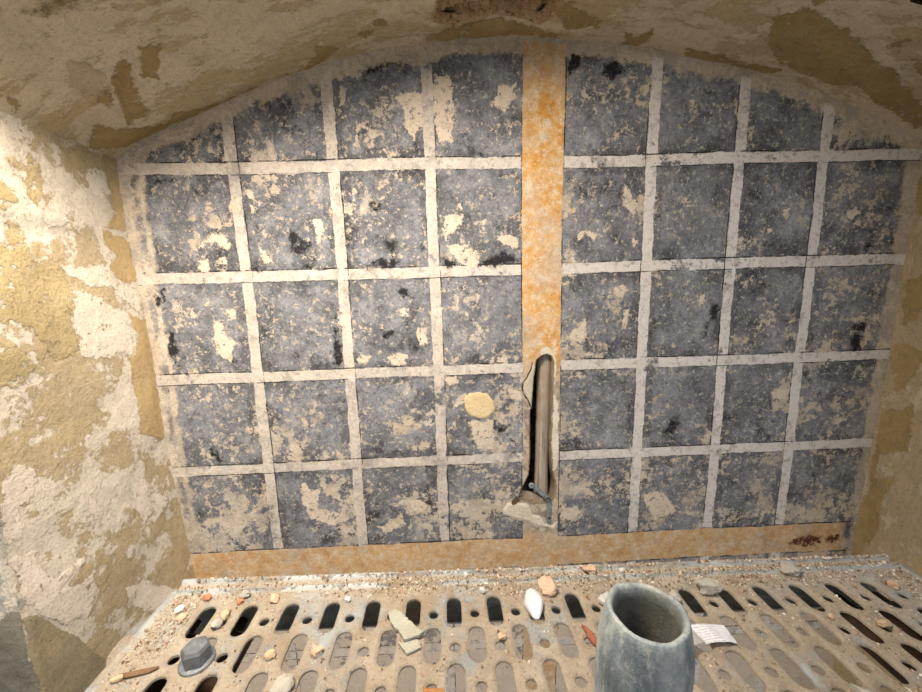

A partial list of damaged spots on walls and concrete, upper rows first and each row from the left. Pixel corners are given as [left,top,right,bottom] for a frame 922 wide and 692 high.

spalling [425,0,603,42]
peeling [684,0,922,129]
peeling [0,44,266,440]
peeling [258,247,276,266]
peeling [311,219,325,249]
spalling [508,347,559,471]
peeling [468,419,495,452]
peeling [300,482,350,526]
peeling [377,514,406,534]
peeling [408,498,429,515]
spalling [494,497,581,531]
peeling [641,491,676,521]